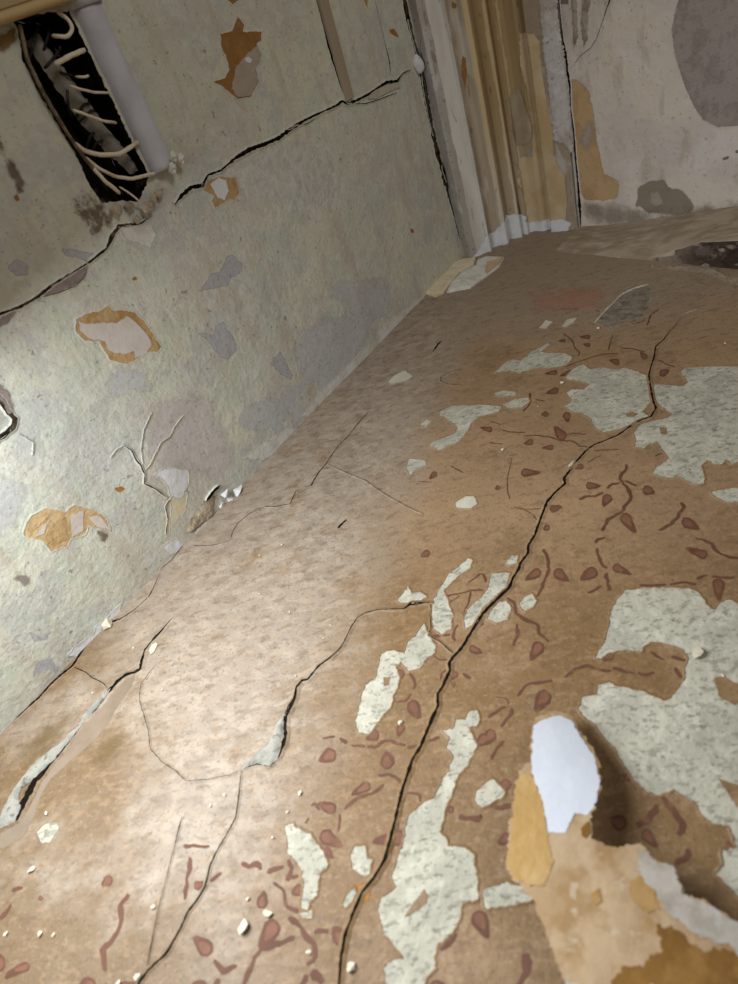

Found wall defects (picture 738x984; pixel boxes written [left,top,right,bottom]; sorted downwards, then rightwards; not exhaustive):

peeling [212,0,263,101]
crack [172,0,462,246]
crack [558,0,612,226]
peeling [670,0,738,129]
crack [0,214,153,327]
peeling [74,303,163,366]
peeling [22,503,112,554]
crack [0,316,683,984]
peeling [575,586,738,899]
peeling [35,820,62,846]